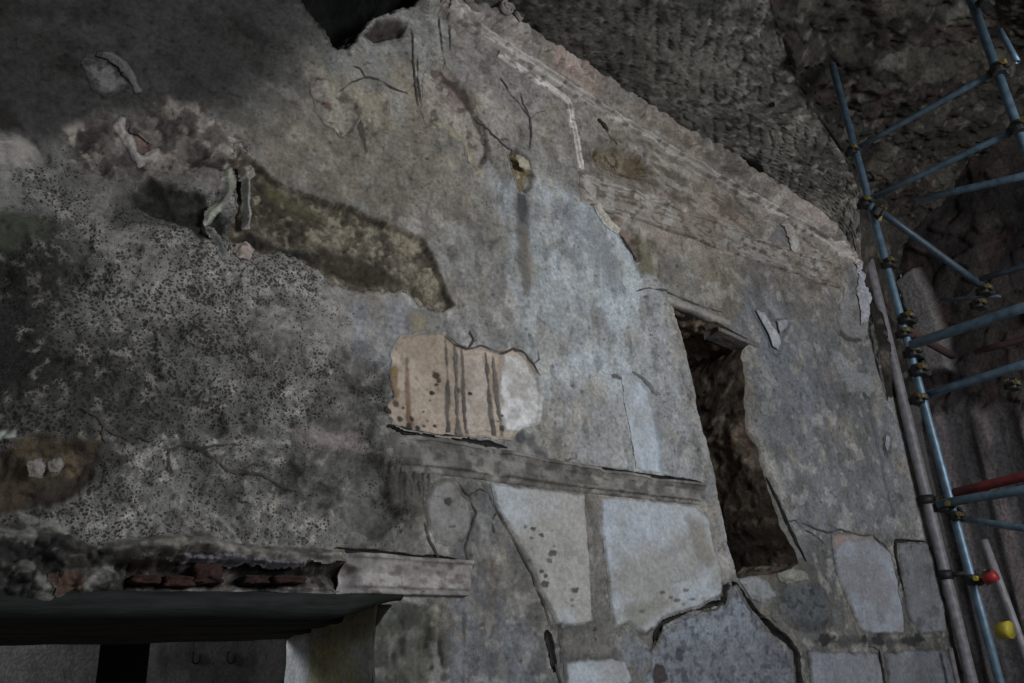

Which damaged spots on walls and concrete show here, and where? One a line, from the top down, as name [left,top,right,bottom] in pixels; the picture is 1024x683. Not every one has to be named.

flaking render [112,116,161,169]
crack [340,31,422,111]
spalling [362,15,410,46]
crack [472,77,546,156]
damp [203,165,255,260]
spalling [225,145,457,313]
damp [516,193,530,268]
spalling [752,306,794,357]
spalling [0,430,110,534]
crack [766,477,928,590]
crack [336,482,563,683]
crack [651,581,804,683]